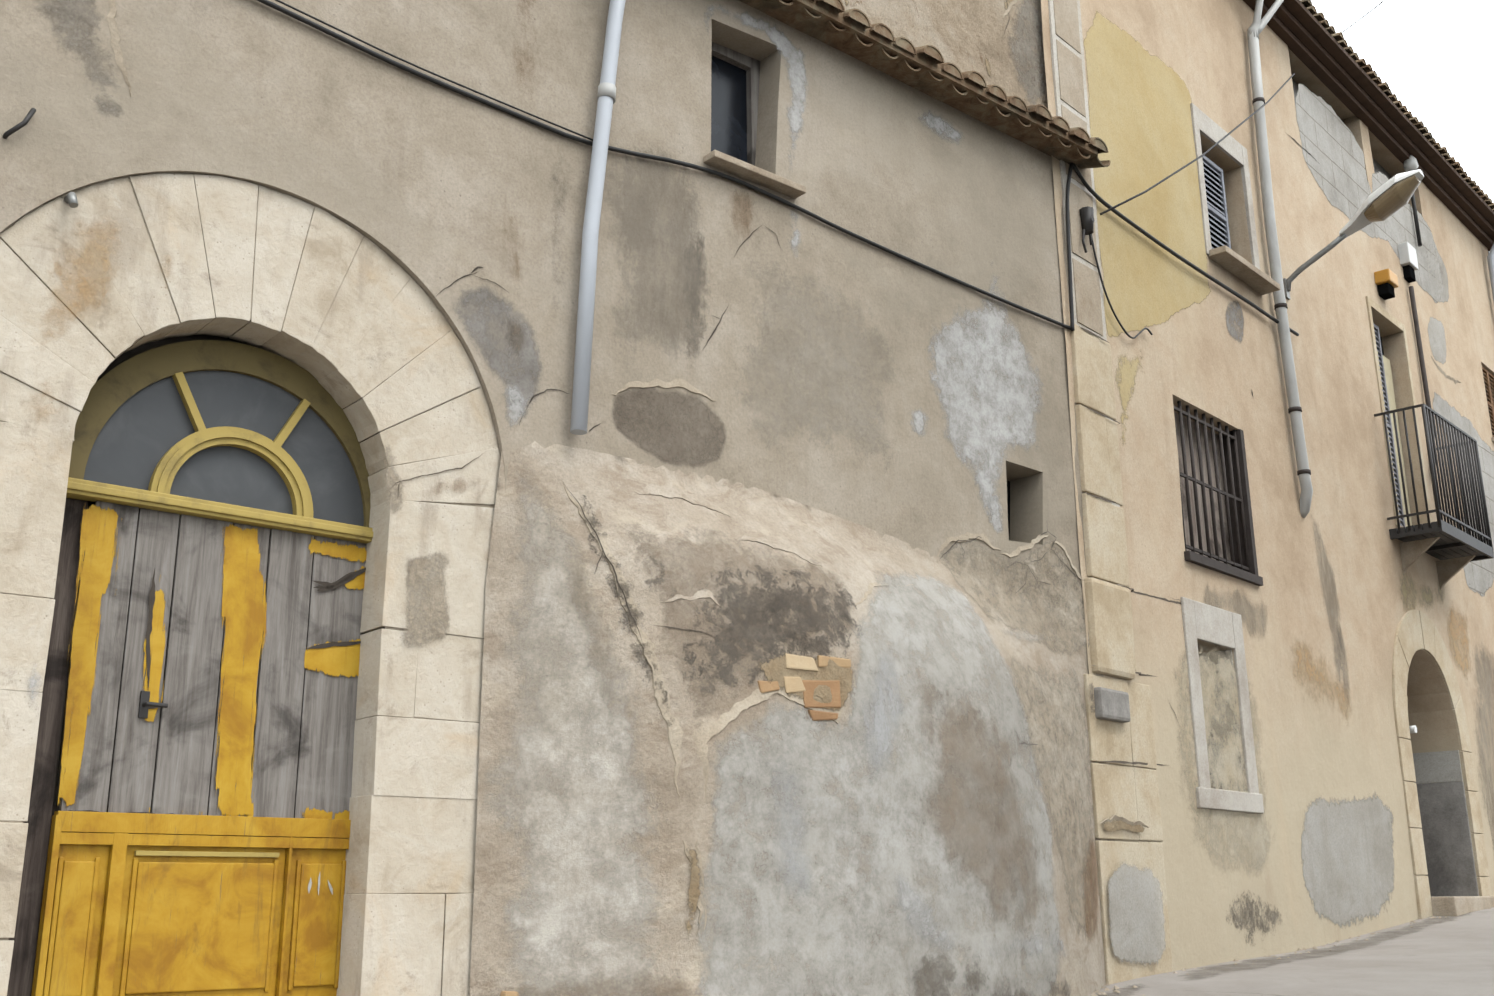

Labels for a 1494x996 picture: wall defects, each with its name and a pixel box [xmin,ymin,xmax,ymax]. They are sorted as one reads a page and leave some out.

peeling [1295,83,1460,384]
peeling [58,503,122,806]
peeling [142,575,166,722]
peeling [186,524,267,817]
peeling [304,639,361,678]
leakage [583,495,667,702]
crack [559,476,719,640]
peeling [495,480,854,996]
leakage [640,532,862,707]
crack [939,536,981,563]
crack [1004,529,1086,594]
peeling [1433,393,1494,597]